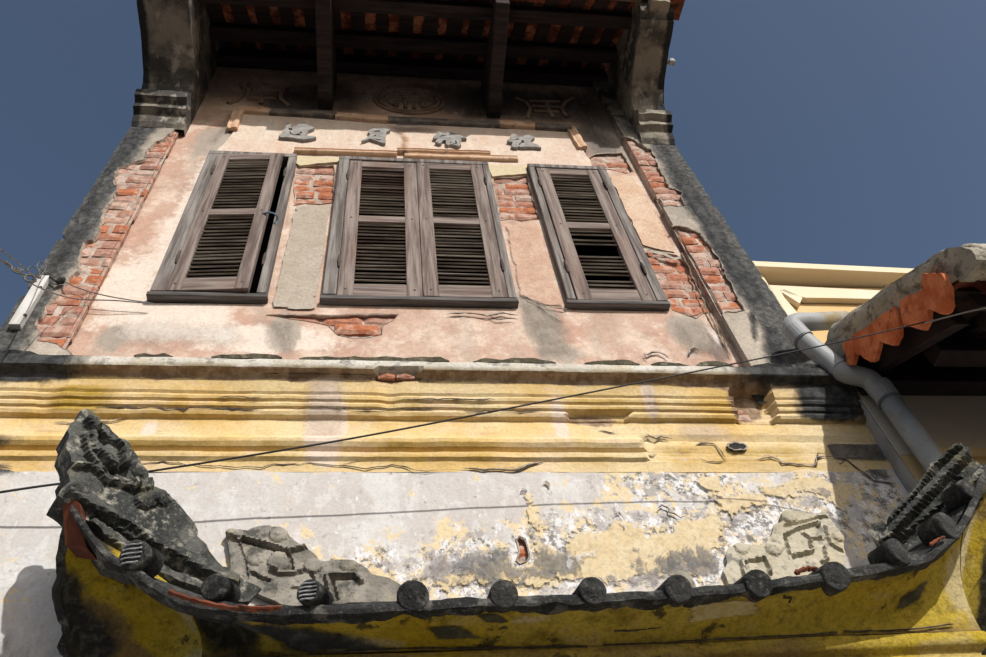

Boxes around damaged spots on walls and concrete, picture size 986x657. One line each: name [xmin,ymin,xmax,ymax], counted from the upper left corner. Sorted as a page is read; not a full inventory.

spalling [34,131,179,354]
spalling [293,165,335,206]
spalling [268,313,399,339]
peeling [493,176,562,305]
spalling [589,136,745,323]
damp [660,145,856,422]
peeling [416,475,865,592]